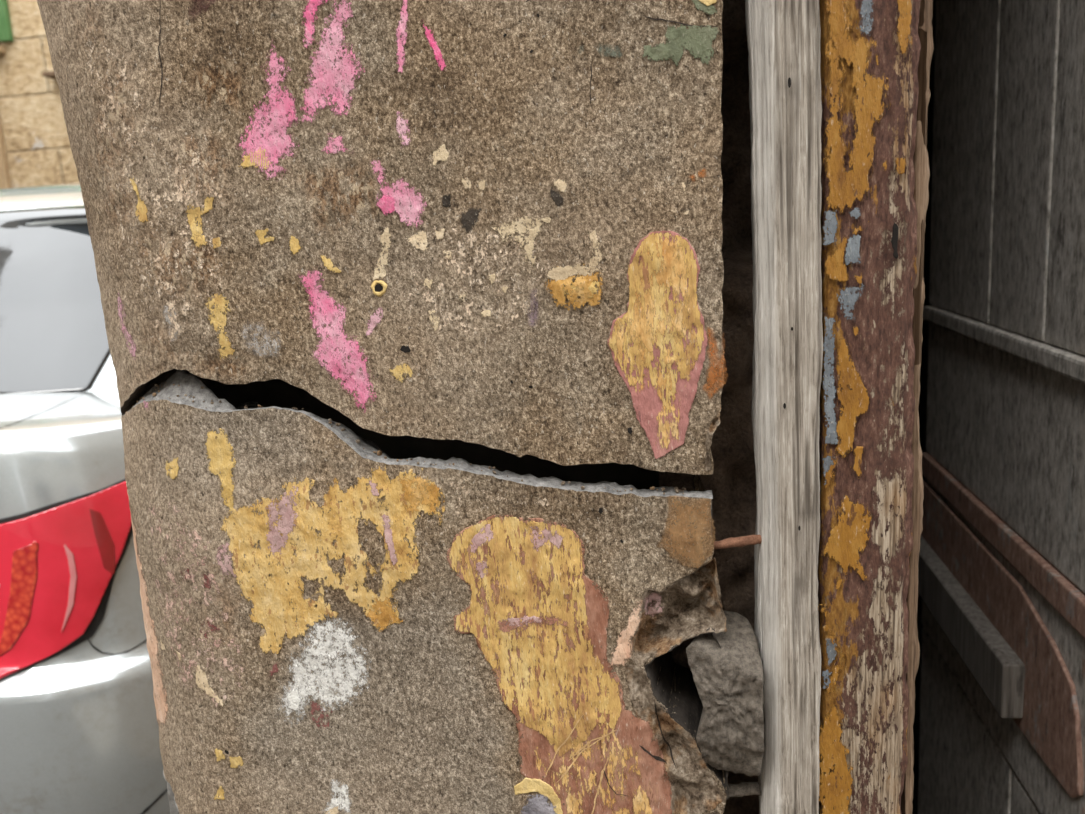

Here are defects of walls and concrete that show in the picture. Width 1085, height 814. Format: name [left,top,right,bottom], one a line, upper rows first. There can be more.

crack [121,369,713,533]
peeling [125,428,729,814]